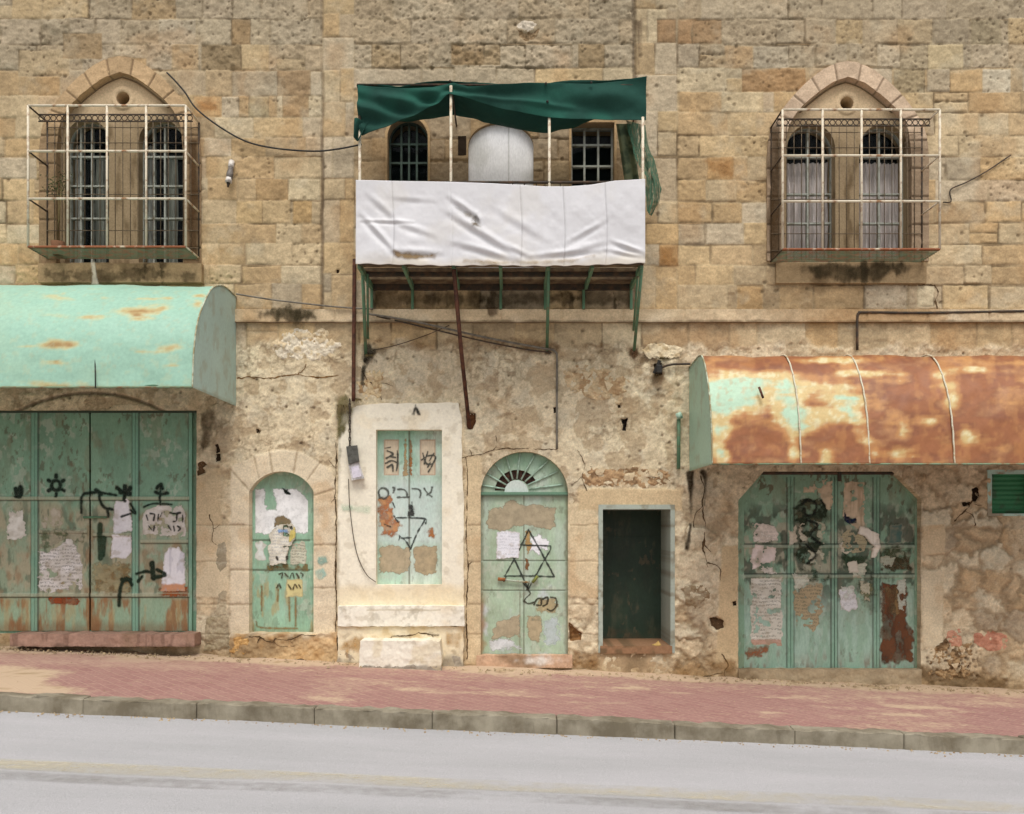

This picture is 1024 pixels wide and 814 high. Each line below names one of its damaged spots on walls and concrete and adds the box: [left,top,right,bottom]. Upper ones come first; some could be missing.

damp [809,259,906,282]
flaking render [270,328,341,361]
crack [237,364,391,400]
flaking render [582,467,672,488]
crack [693,476,721,580]
corrosion [48,597,80,605]
corrosion [879,557,915,664]
spalling [936,629,1008,670]